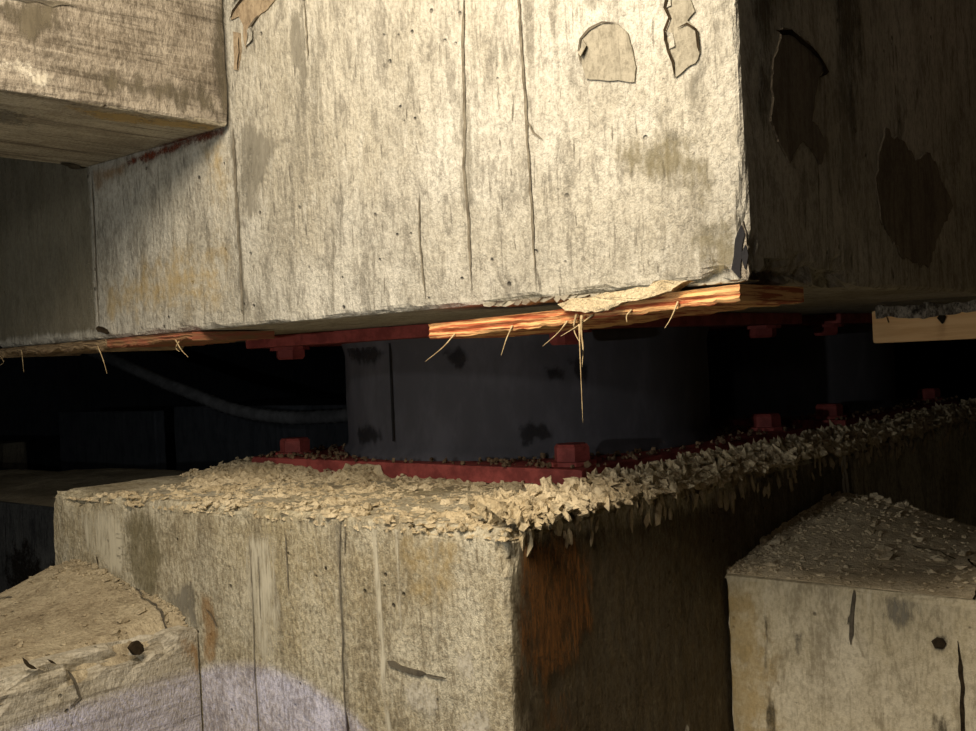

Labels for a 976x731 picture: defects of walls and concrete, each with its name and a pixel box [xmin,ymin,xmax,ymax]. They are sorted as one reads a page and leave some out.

peeling [230,0,276,71]
peeling [577,21,637,83]
peeling [663,0,701,78]
corrosion [128,128,223,164]
crack [461,0,472,289]
crack [517,0,543,284]
water stain [4,540,41,588]
crack [339,521,349,731]
crack [847,590,855,645]
crack [957,641,965,731]